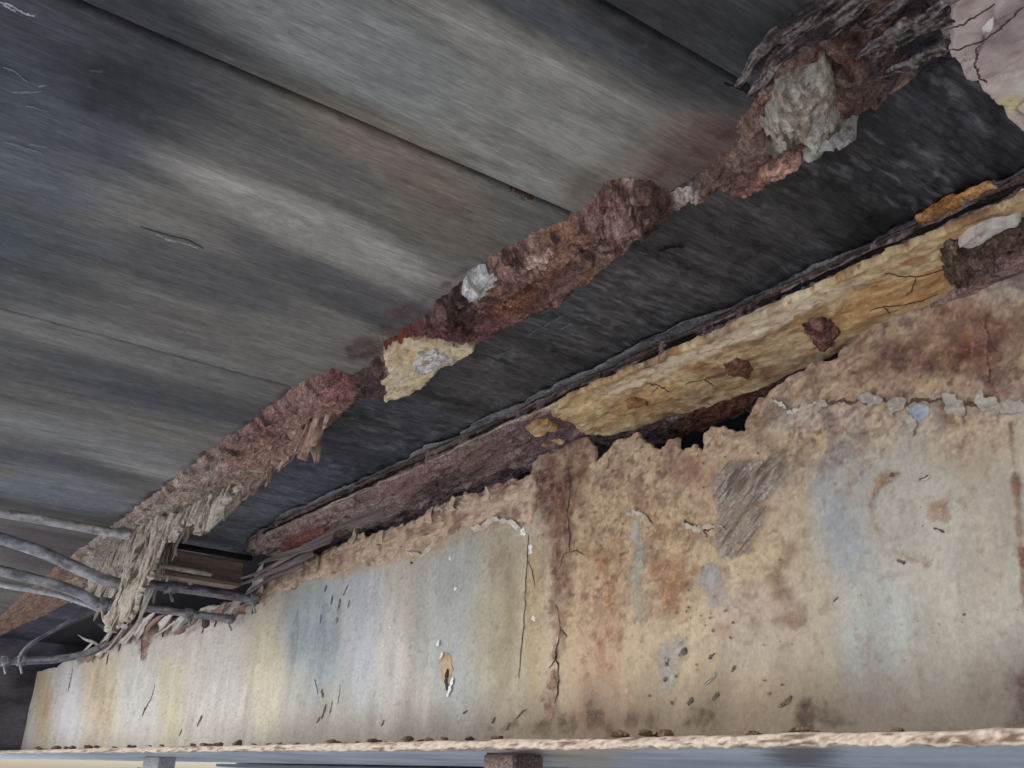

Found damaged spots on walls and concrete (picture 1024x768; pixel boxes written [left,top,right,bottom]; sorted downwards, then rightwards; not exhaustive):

peeling [734,0,960,159]
crack [942,4,1023,84]
peeling [381,335,476,402]
corrosion [625,396,648,410]
peeling [525,190,1024,447]
peeling [251,472,539,624]
spalling [436,640,454,697]
crack [518,535,535,679]
corrosion [530,462,583,637]
crack [549,605,567,704]
crack [559,468,584,569]
corrosion [1011,473,1024,598]